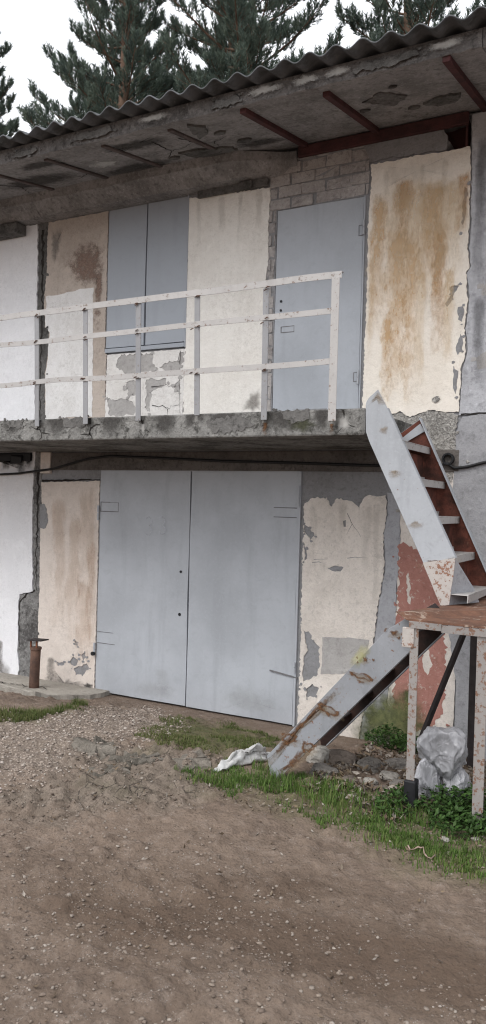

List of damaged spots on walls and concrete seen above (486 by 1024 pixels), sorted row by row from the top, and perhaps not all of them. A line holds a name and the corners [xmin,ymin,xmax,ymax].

spalling [360,85,461,113]
leakage [70,246,101,315]
peeling [446,282,486,399]
peeling [102,351,184,417]
crack [18,472,100,647]
peeling [302,522,317,563]
peeling [54,639,91,676]
peeling [298,623,322,700]
rust [276,700,339,771]